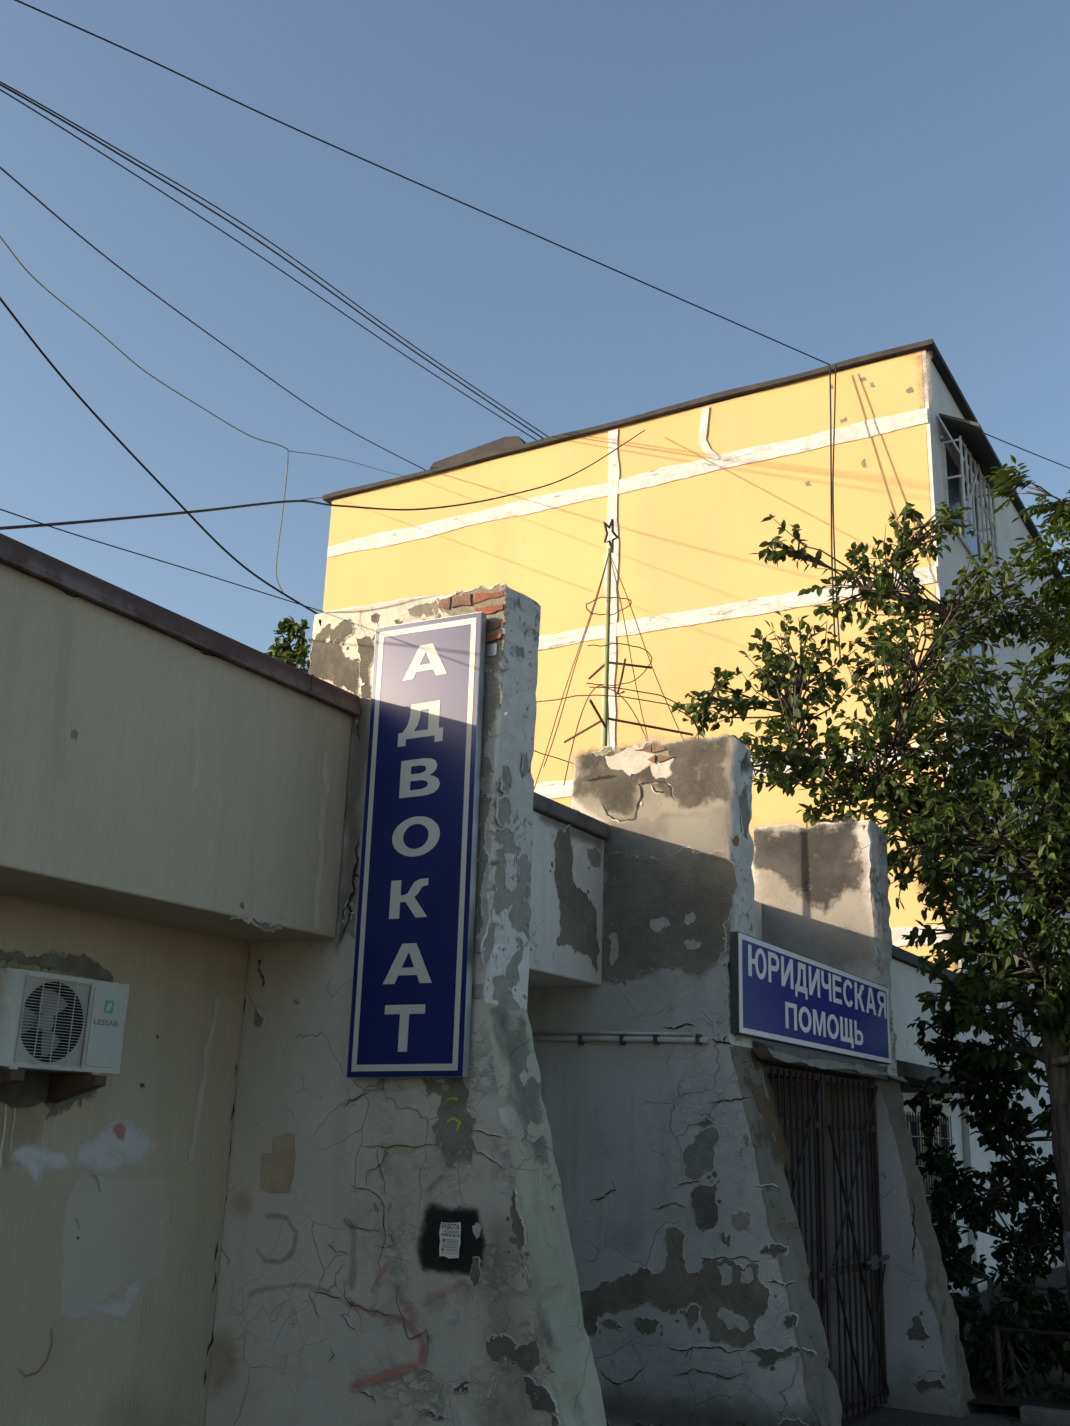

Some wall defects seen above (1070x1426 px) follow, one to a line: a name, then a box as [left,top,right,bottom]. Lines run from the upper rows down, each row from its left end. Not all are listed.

peeling [308,582,533,1012]
peeling [549,738,750,986]
leakage [753,818,864,910]
crack [709,1097,754,1105]
crack [470,1128,506,1171]
crack [589,1181,618,1203]
crack [653,1179,703,1212]
crack [309,1143,439,1376]
peeling [580,1117,830,1371]
crack [699,1256,797,1287]
peeling [486,1333,561,1426]
crack [600,1344,747,1387]